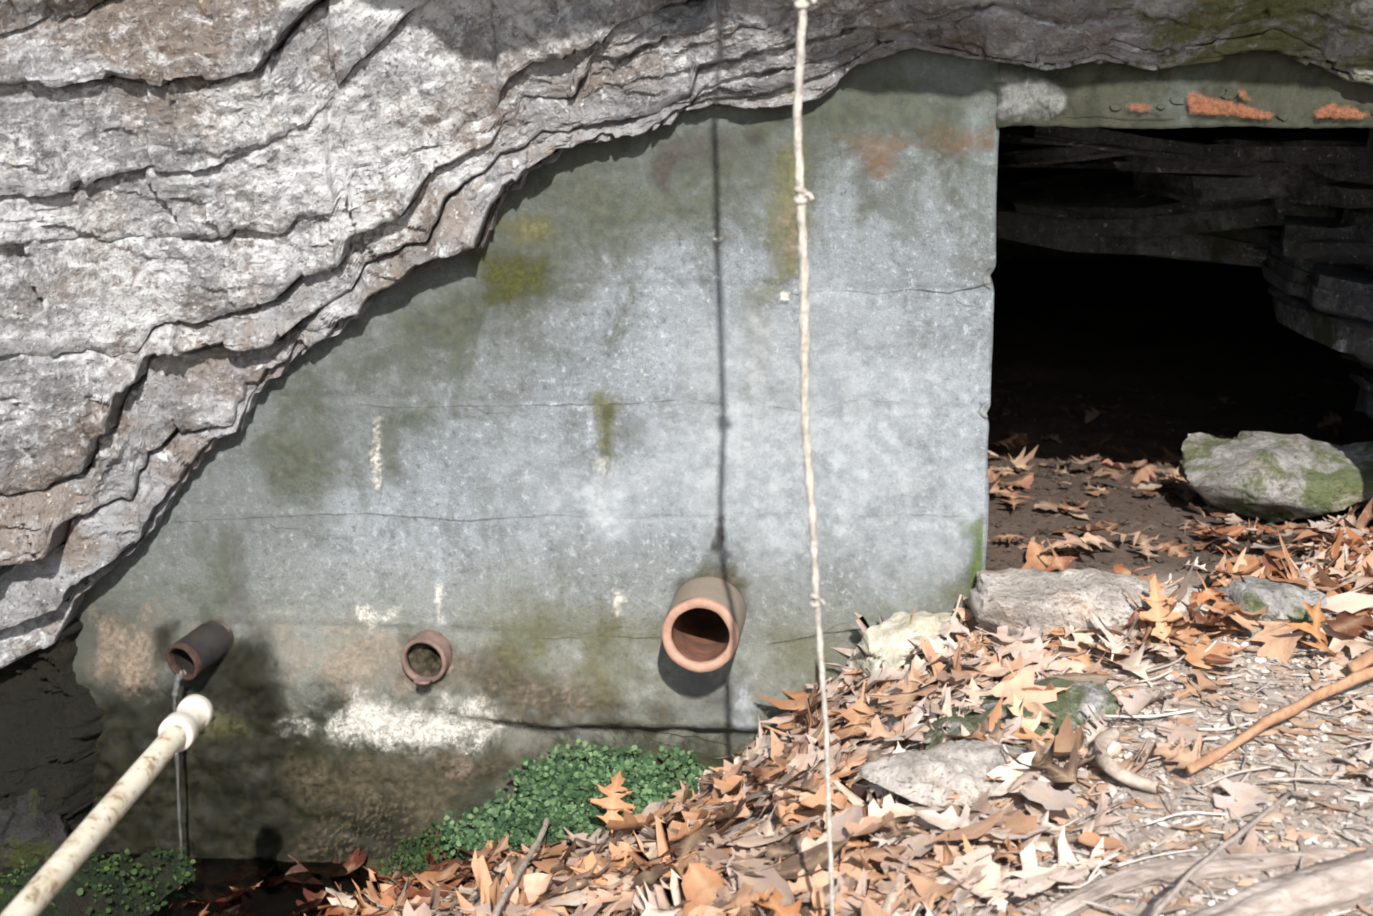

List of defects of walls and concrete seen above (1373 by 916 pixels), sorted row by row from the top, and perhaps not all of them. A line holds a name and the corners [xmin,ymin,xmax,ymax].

damp [770,150,807,279]
damp [434,584,444,620]
damp [613,592,624,617]
damp [89,607,521,885]